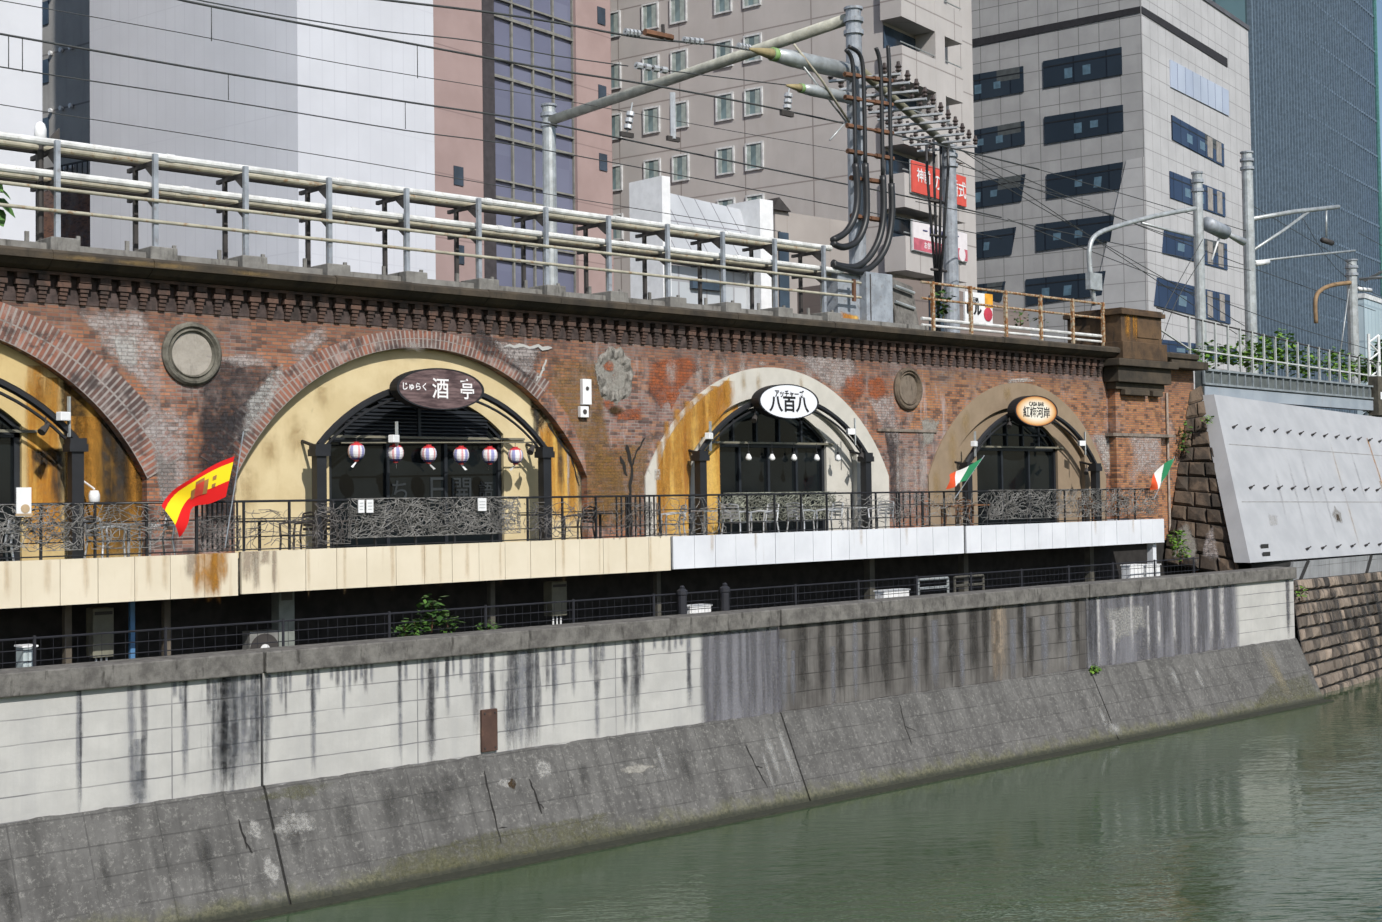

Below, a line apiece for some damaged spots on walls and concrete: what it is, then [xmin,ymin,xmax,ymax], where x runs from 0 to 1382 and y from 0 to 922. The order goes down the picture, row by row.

rust [27,365,142,558]
rust [555,365,738,535]
rust [188,553,227,587]
rust [244,550,276,584]
damp [129,685,147,803]
damp [173,681,187,761]
damp [398,643,604,738]
damp [623,584,1237,722]
crack [484,771,507,842]